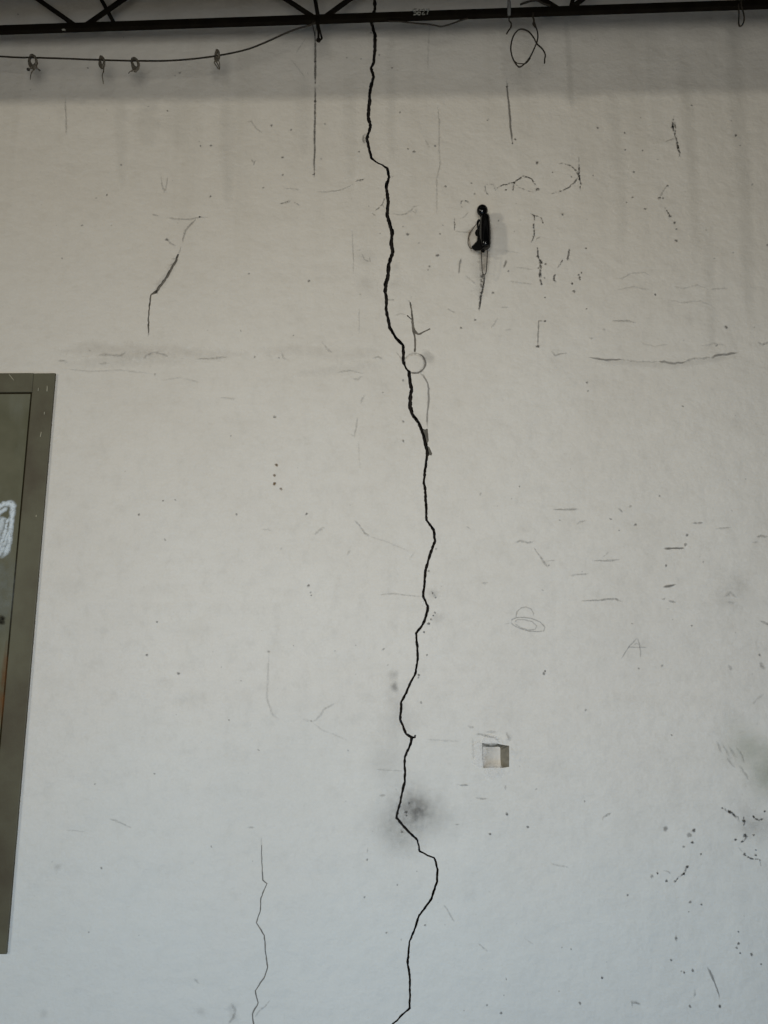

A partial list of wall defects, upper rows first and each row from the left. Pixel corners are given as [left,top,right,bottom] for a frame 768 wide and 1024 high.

crack [252,845,268,1024]
crack [365,0,439,1024]